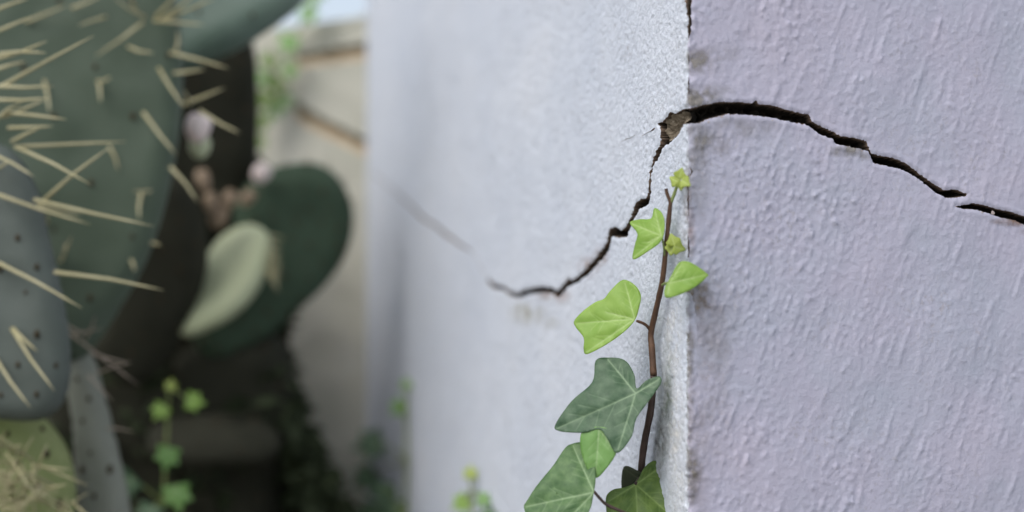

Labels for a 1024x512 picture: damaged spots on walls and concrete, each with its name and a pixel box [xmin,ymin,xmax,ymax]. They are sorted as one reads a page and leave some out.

crack [475,0,1024,299]